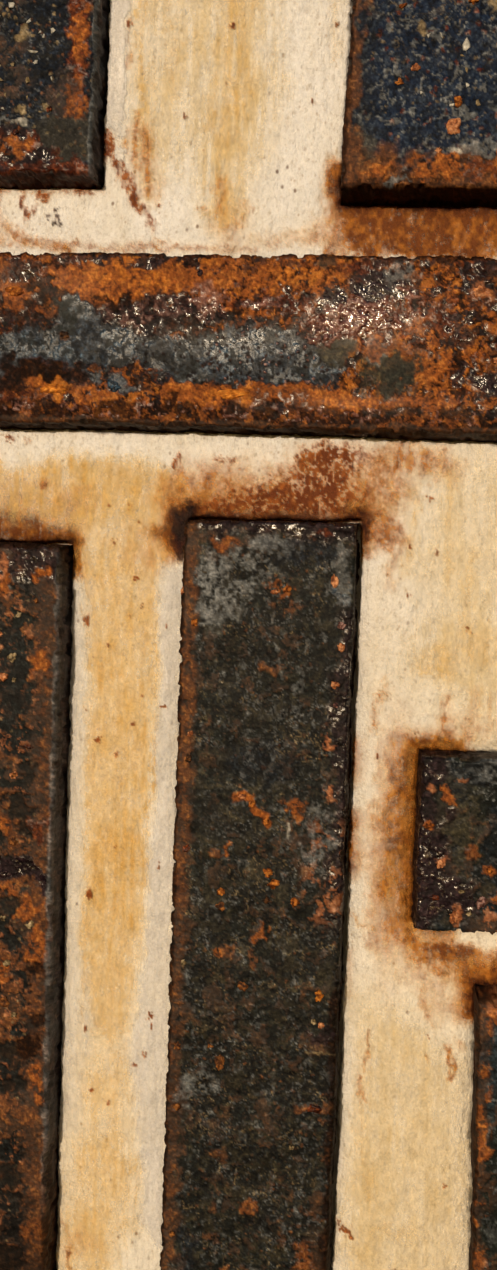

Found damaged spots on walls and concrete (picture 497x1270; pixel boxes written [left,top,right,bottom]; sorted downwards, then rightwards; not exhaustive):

rust [0,0,497,473]
rust [0,455,111,1270]
rust [150,440,402,1270]
rust [372,714,497,1270]